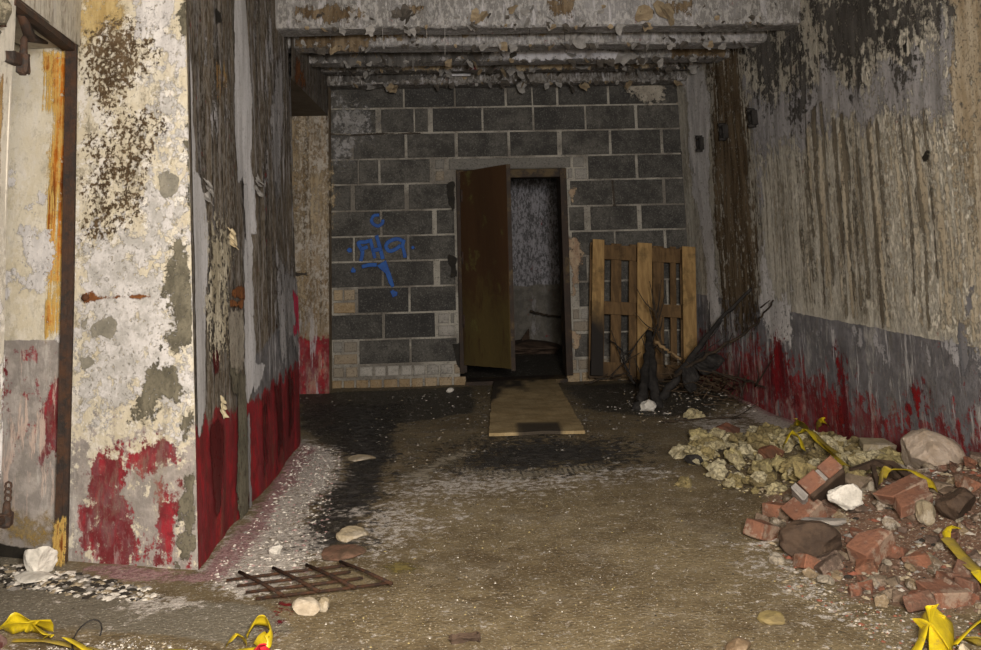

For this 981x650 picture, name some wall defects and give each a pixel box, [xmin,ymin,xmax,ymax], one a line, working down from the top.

corrosion [42,49,65,339]
corrosion [83,291,151,304]
water stain [78,0,169,247]
peeling [73,0,214,455]
flaking render [170,466,196,570]
water stain [210,419,224,516]
peeling [203,0,293,519]
peeling [275,243,299,377]
peeling [301,0,770,333]
water stain [768,329,799,407]
water stain [666,0,969,340]
peeling [943,336,981,384]